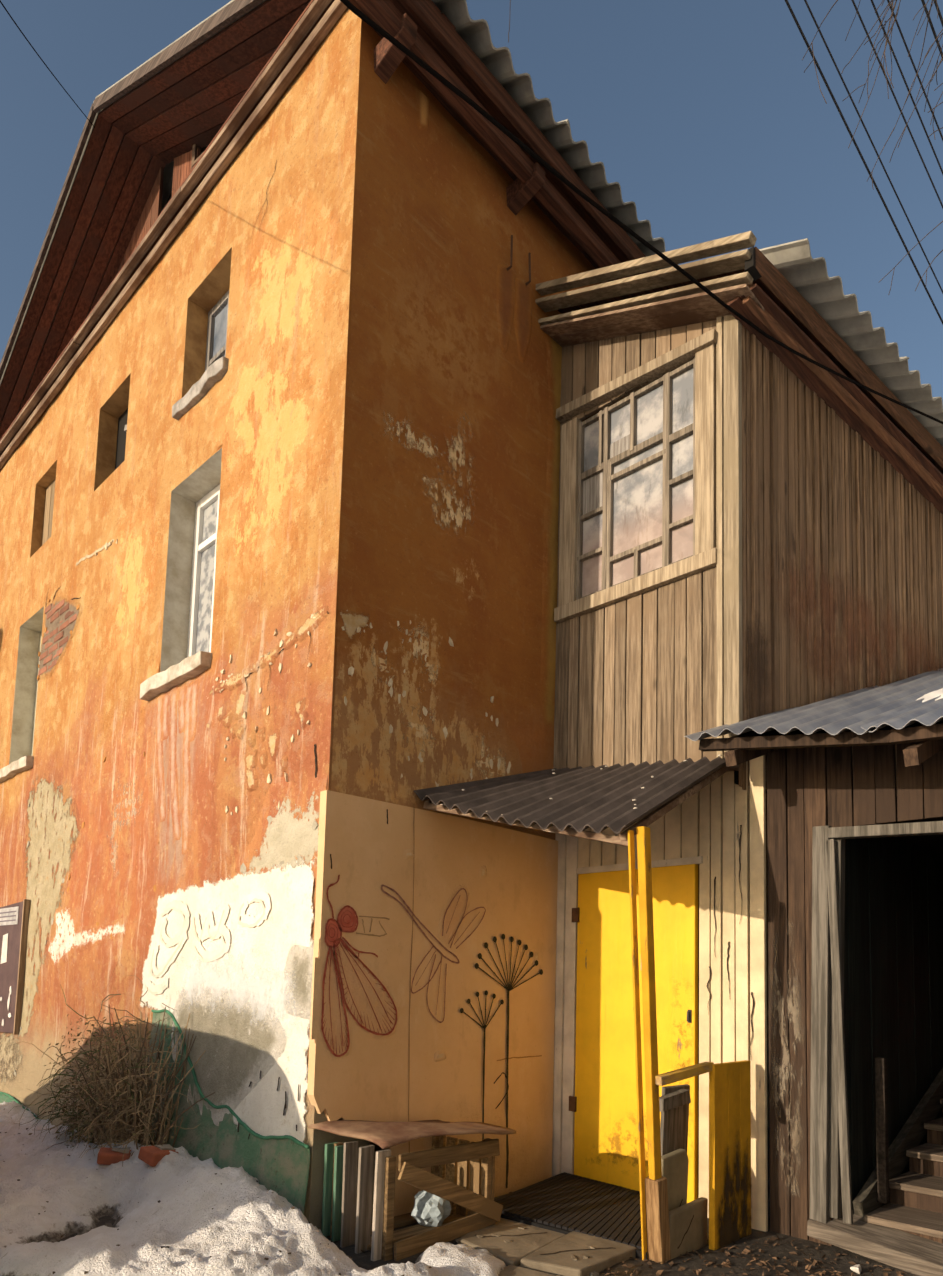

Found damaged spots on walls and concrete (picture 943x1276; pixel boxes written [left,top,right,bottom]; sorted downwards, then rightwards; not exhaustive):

flaking render [37,596,83,681]
peeling [206,78,565,885]
peeling [0,718,160,1098]